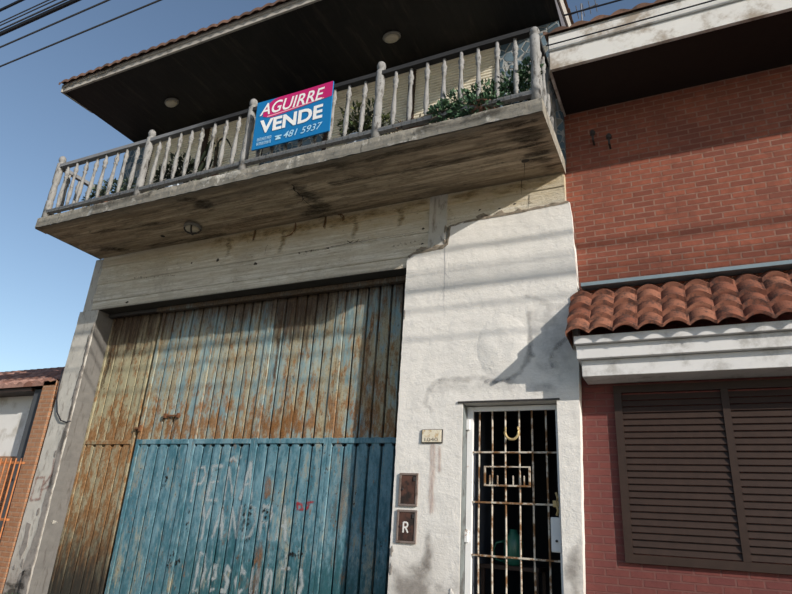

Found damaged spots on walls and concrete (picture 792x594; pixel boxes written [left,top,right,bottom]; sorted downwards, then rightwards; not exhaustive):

leakage [481,120,557,169]
spalling [408,201,569,258]
corrosion [101,315,155,388]